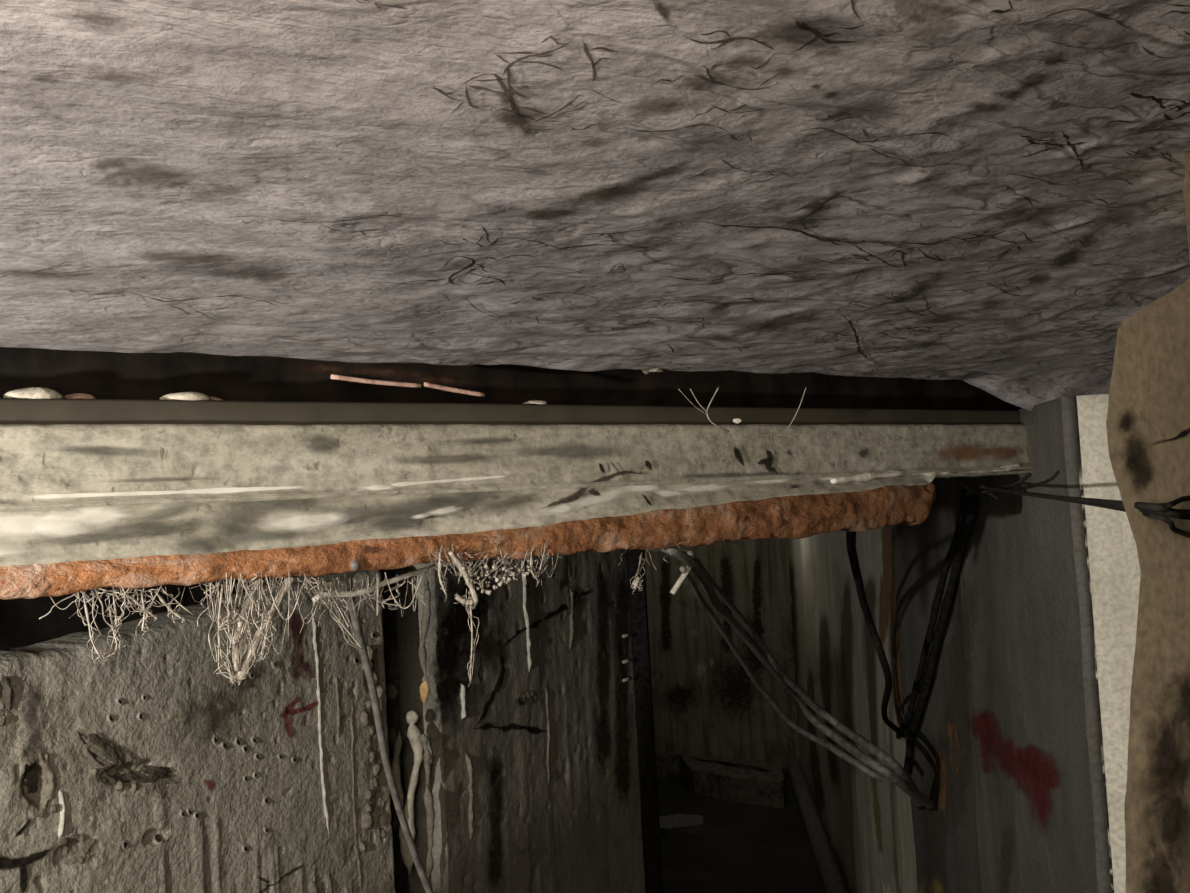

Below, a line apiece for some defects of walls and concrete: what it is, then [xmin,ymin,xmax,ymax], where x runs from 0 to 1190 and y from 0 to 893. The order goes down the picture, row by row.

crack [357,0,406,9]
crack [989,0,1190,58]
crack [433,0,863,189]
crack [227,214,408,235]
crack [395,92,1190,377]
crack [1154,428,1190,444]
spalling [0,675,14,727]
damp [431,577,503,723]
damp [596,573,630,799]
spalling [22,746,57,819]
damp [391,722,435,880]
damp [489,757,502,884]